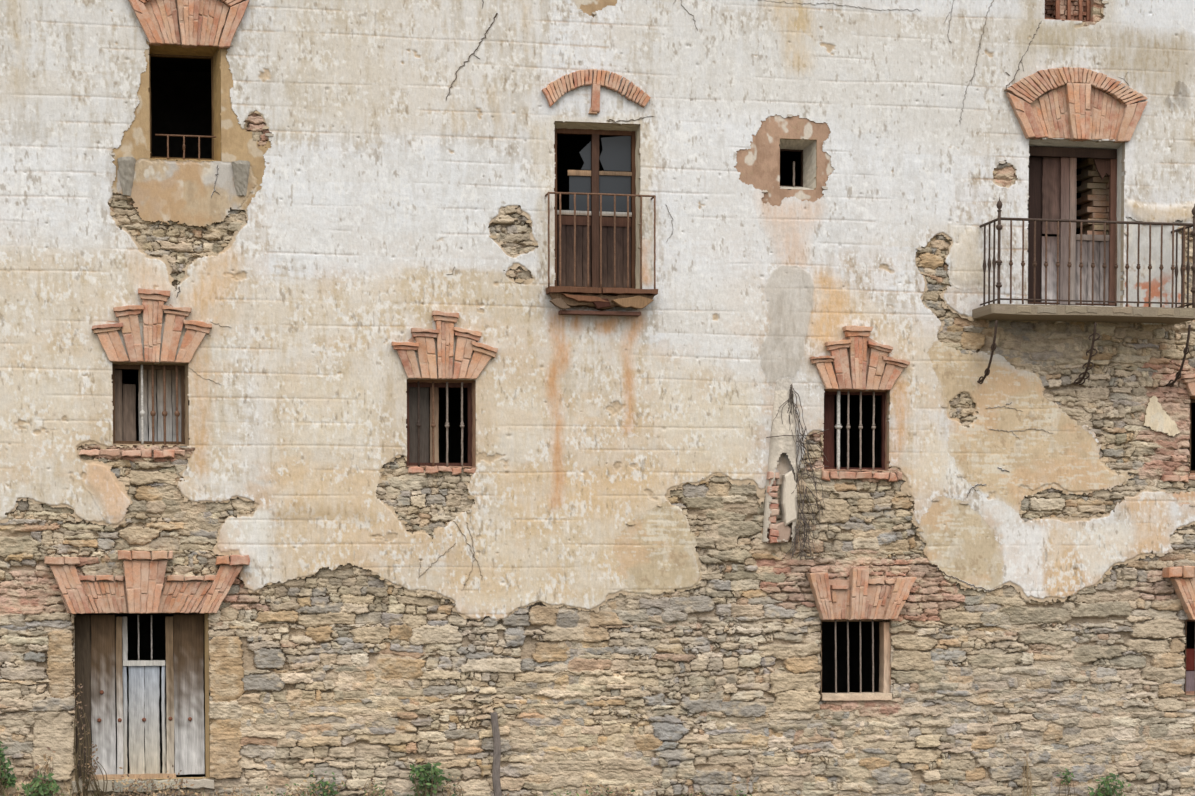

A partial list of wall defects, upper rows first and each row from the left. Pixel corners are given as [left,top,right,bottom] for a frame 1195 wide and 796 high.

crack [446,0,499,100]
flaking render [574,0,617,18]
crack [959,0,994,123]
crack [1005,21,1042,89]
flaking render [108,39,274,291]
flaking render [734,114,835,206]
flaking render [488,205,538,283]
rust [543,308,649,515]
flaking render [613,217,1195,604]
flaking render [0,444,255,607]
flaking render [376,455,475,537]
flaking render [221,563,450,607]